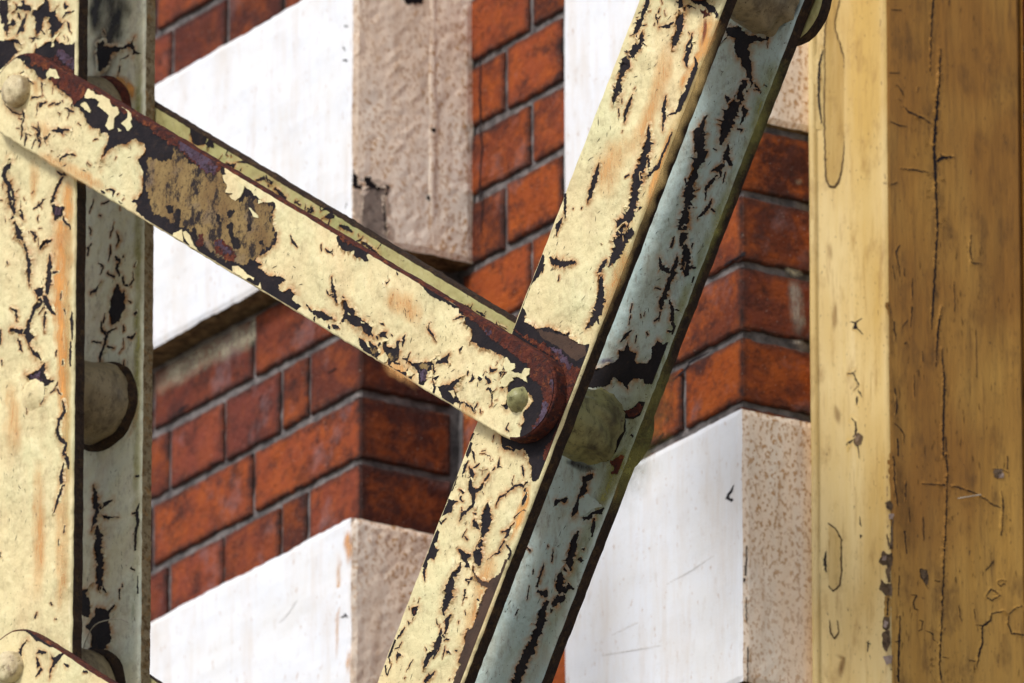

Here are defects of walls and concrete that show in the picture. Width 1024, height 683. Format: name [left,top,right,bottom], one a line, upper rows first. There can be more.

corrosion [99,75,134,107]
peeling [0,0,589,683]
peeling [551,0,778,537]
spalling [879,500,894,665]
crack [851,0,1024,683]